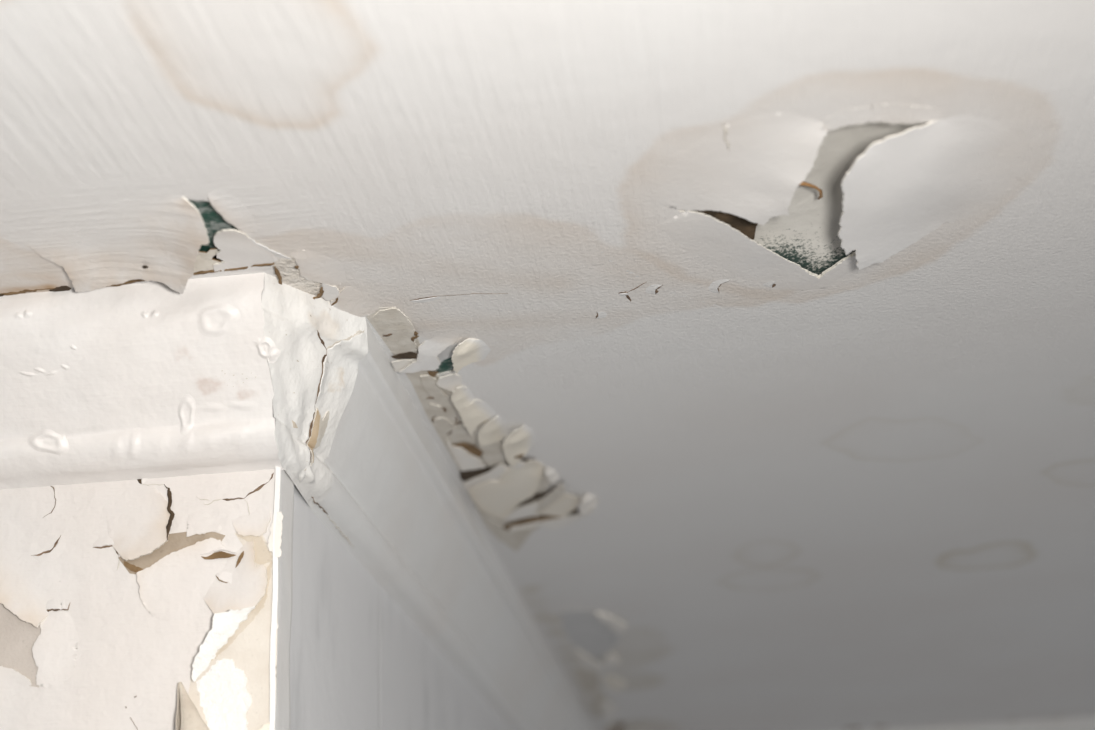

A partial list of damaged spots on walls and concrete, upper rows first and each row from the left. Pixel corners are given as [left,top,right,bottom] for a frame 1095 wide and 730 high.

water stain [112,0,391,135]
water stain [215,62,1071,370]
peeling [2,190,598,552]
crack [286,306,366,471]
peeling [0,523,79,699]
crack [31,485,66,563]
crack [46,599,70,612]
crack [93,471,274,625]
peeling [176,505,284,730]
crack [311,496,354,548]